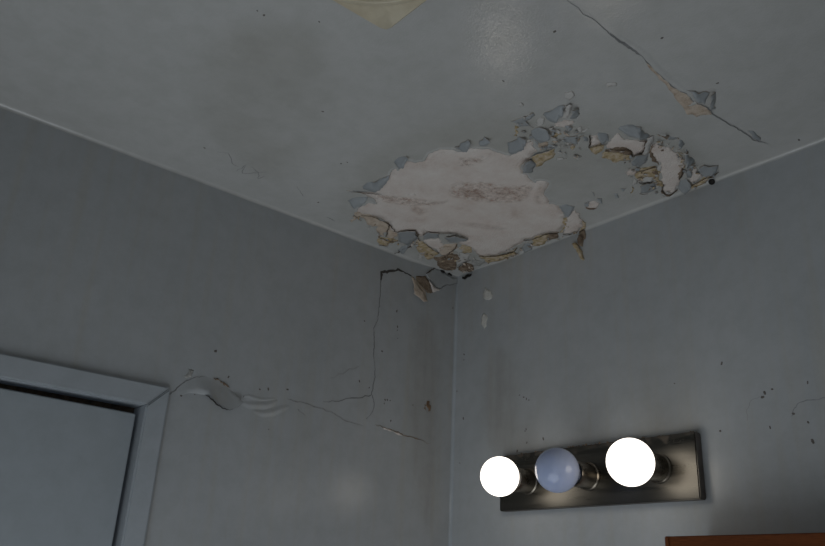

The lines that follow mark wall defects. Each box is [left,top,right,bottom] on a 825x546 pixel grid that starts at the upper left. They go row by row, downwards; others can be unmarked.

crack [567,0,768,144]
peeling [347,137,602,273]
peeling [588,124,719,198]
crack [288,268,428,444]